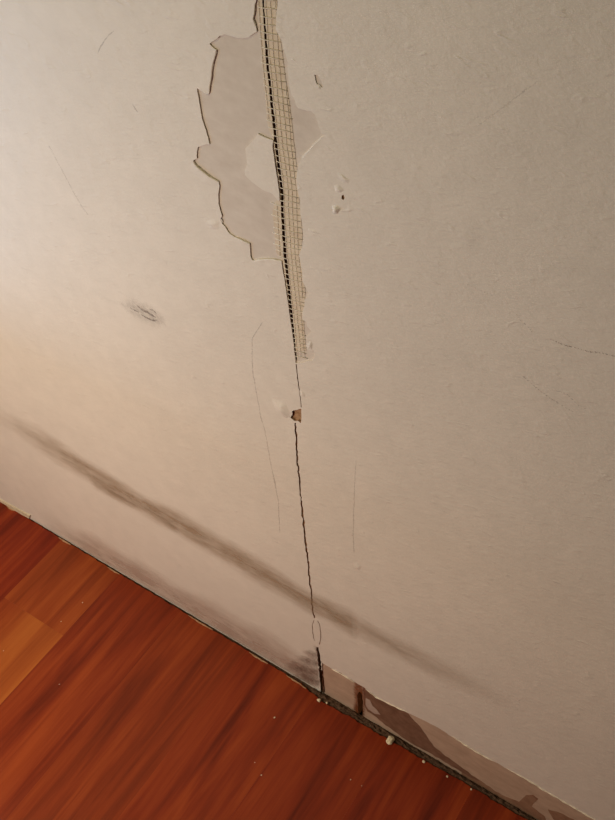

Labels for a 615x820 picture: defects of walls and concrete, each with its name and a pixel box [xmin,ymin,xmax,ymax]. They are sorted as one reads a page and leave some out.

peeling [189,0,315,363]
crack [262,0,324,692]